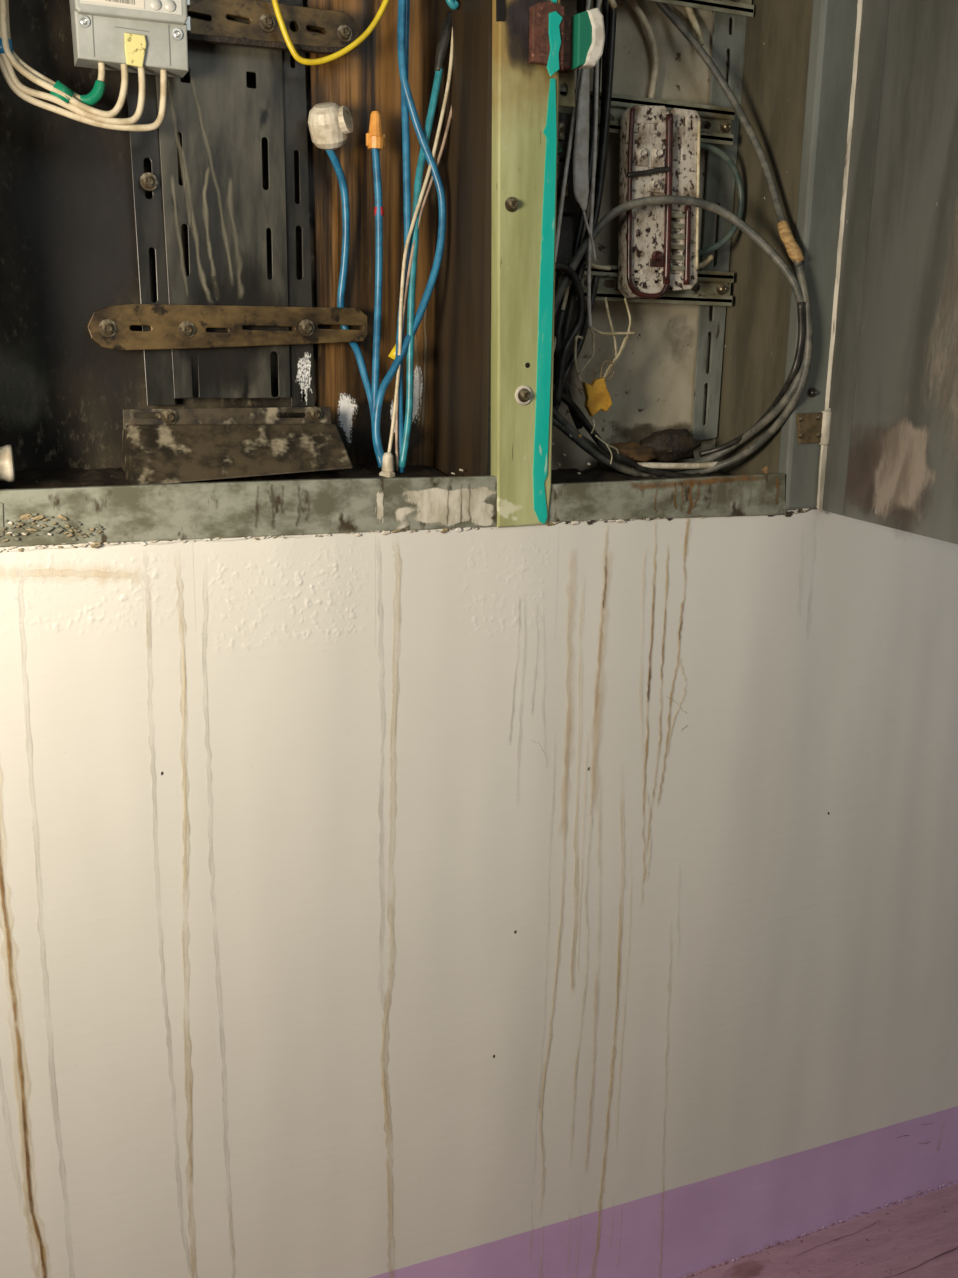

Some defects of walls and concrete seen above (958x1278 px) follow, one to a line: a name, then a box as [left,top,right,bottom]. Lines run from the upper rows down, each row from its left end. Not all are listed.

rust [641,476,756,577]
rust [599,567,607,667]
rust [592,684,600,800]
rust [643,557,685,817]
rust [0,865,45,1278]